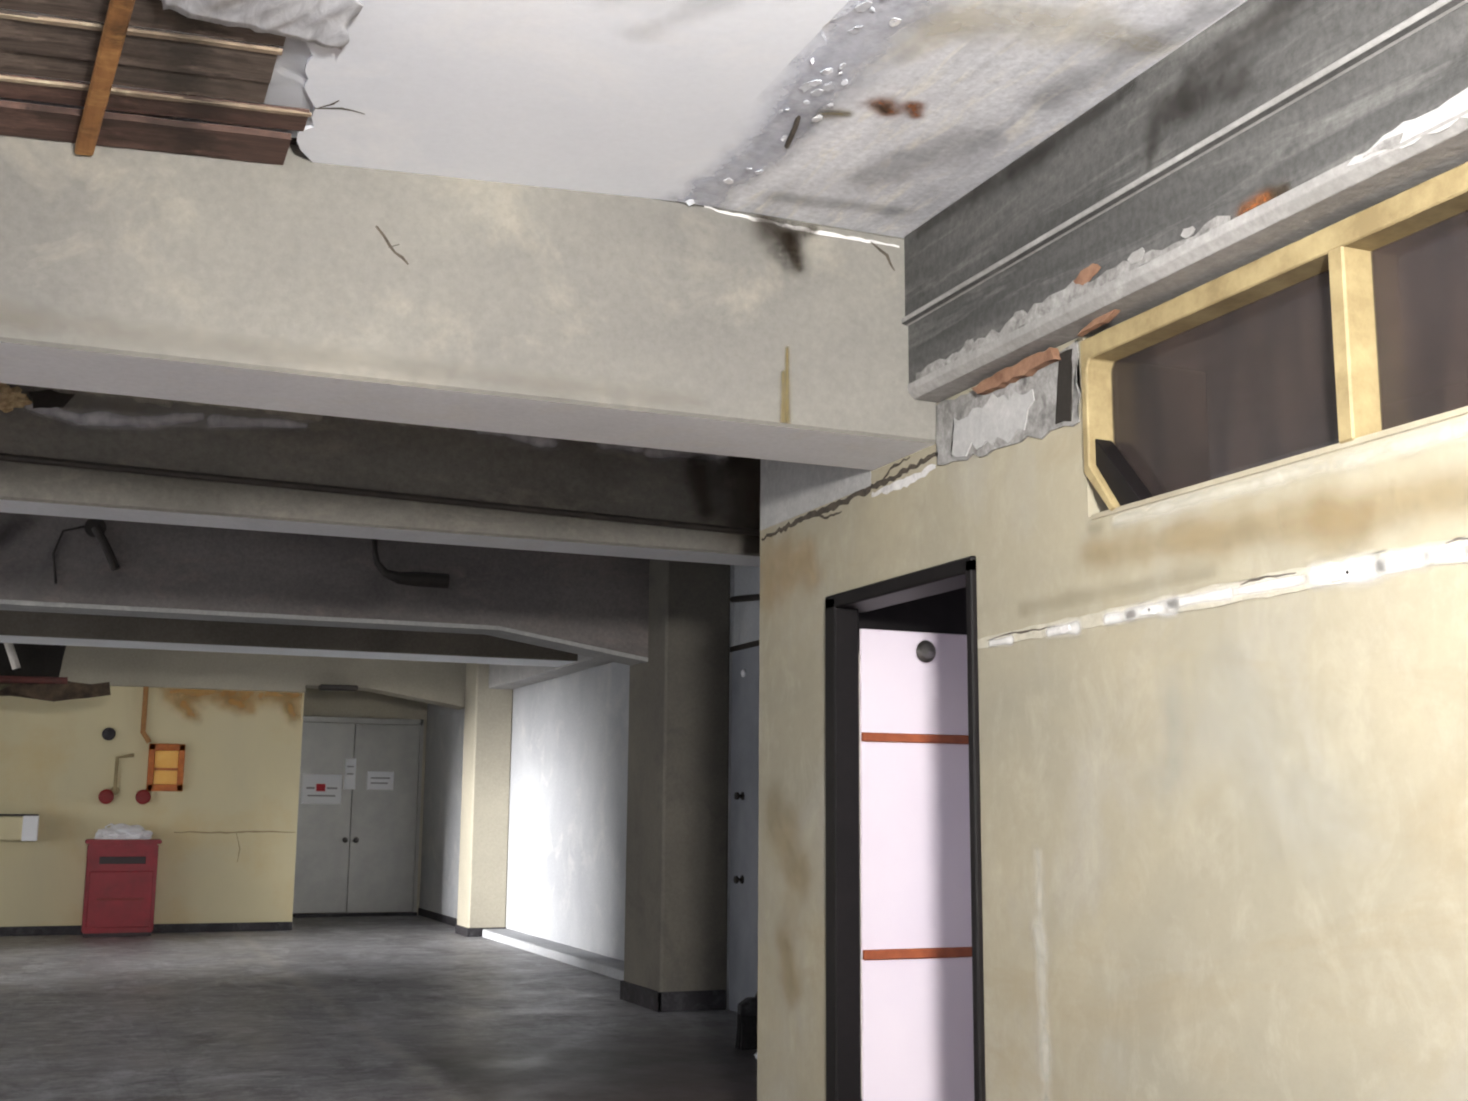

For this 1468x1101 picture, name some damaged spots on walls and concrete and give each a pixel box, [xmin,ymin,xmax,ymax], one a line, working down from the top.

rust [871,99,922,118]
spalling [1347,88,1468,166]
spalling [916,216,1231,380]
spalling [936,309,1121,465]
peeling [978,536,1468,648]
water stain [169,688,302,718]